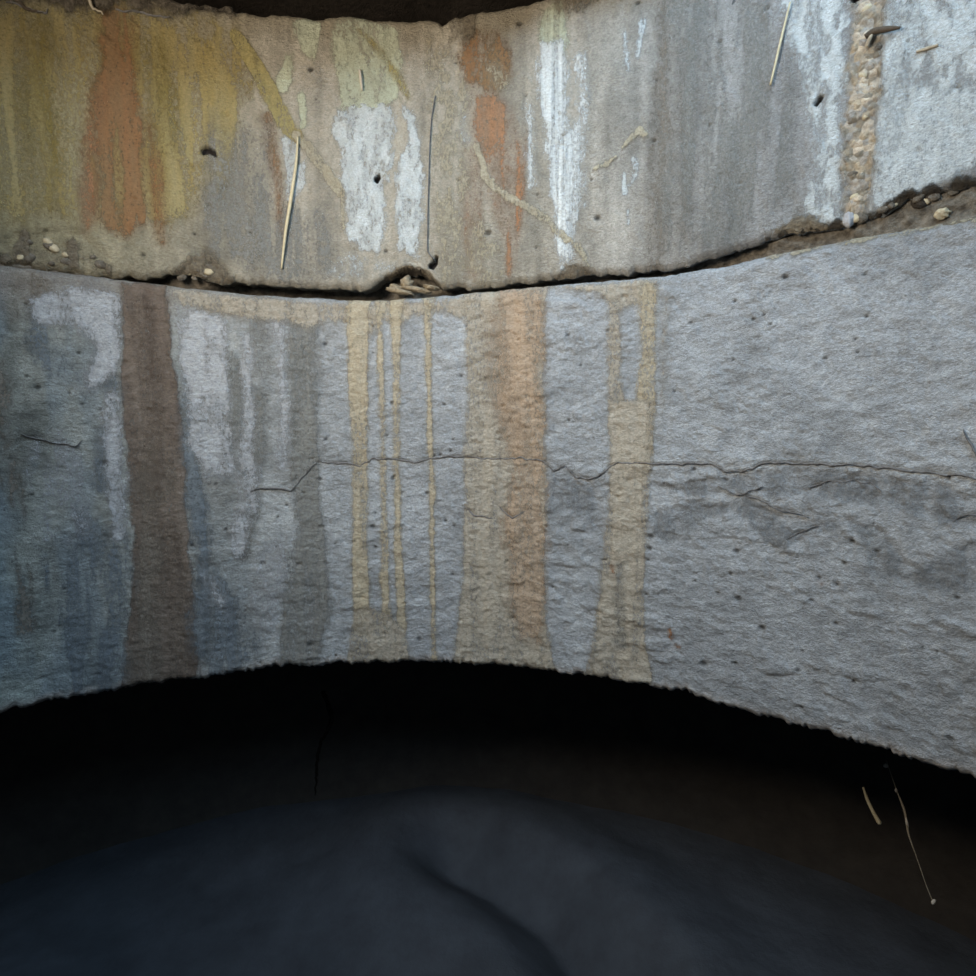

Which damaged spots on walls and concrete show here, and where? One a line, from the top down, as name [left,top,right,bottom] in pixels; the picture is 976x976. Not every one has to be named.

corrosion [457,30,526,275]
water stain [202,0,851,287]
water stain [837,218,976,245]
water stain [868,0,976,217]
water stain [25,286,133,695]
water stain [172,288,468,676]
corrosion [453,286,556,671]
water stain [550,278,668,684]
crack [250,455,976,540]